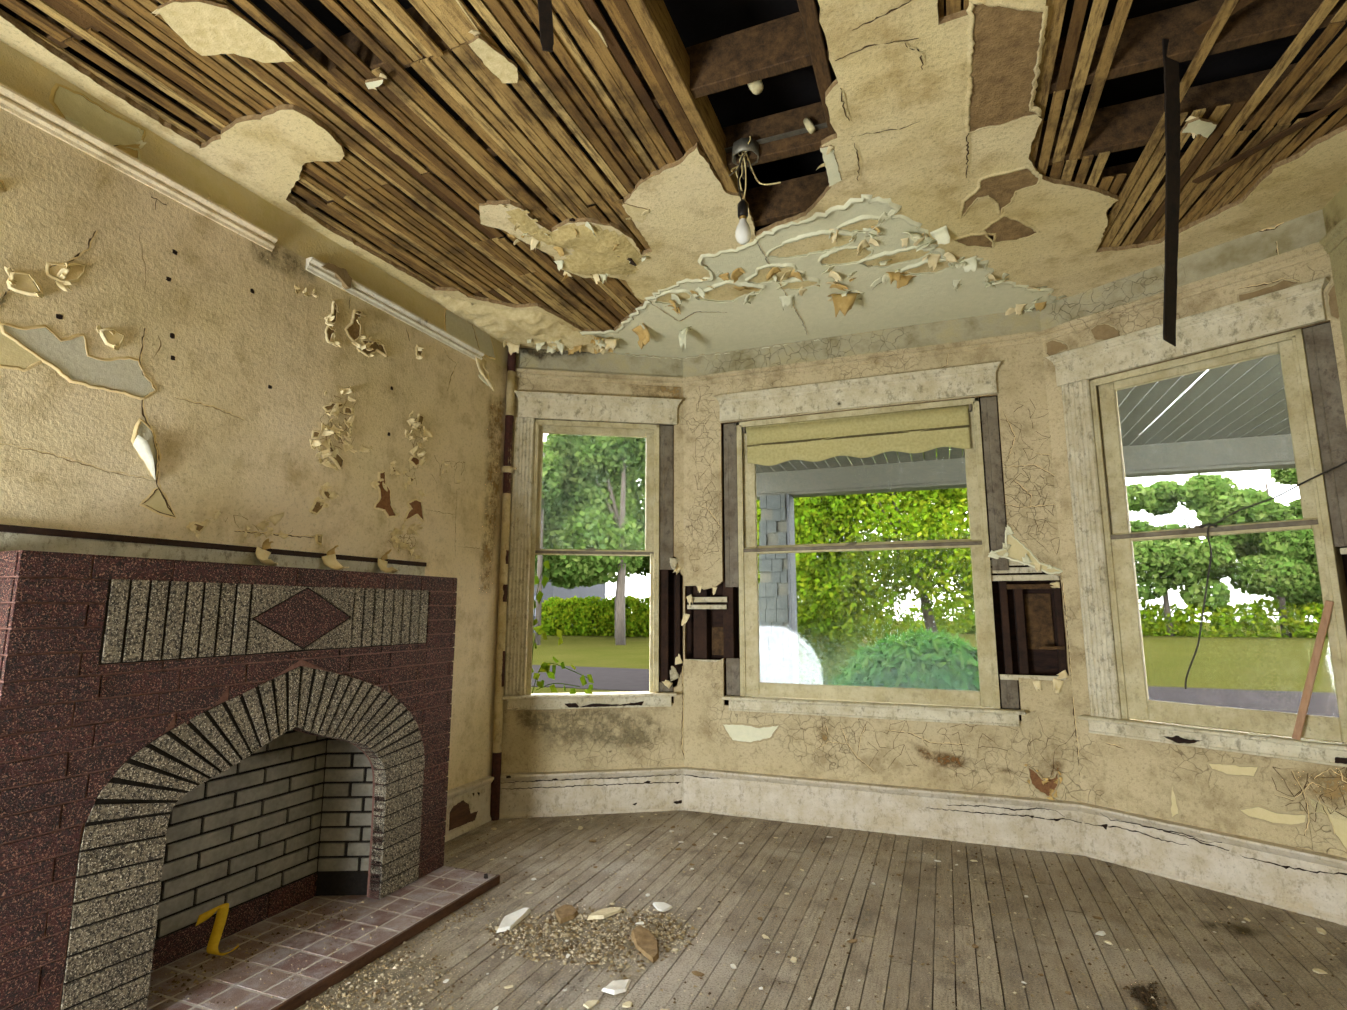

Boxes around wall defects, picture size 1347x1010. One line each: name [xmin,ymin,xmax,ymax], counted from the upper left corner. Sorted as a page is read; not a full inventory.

peeling [49,83,147,161]
crack [835,0,925,180]
spalling [964,0,1048,134]
peeling [580,165,1070,359]
peeling [0,323,157,401]
crack [0,328,245,513]
peeling [131,418,289,541]
peeling [309,386,373,515]
peeling [324,300,388,358]
peeling [370,411,433,560]
peeling [444,308,496,360]
crack [1272,767,1347,836]